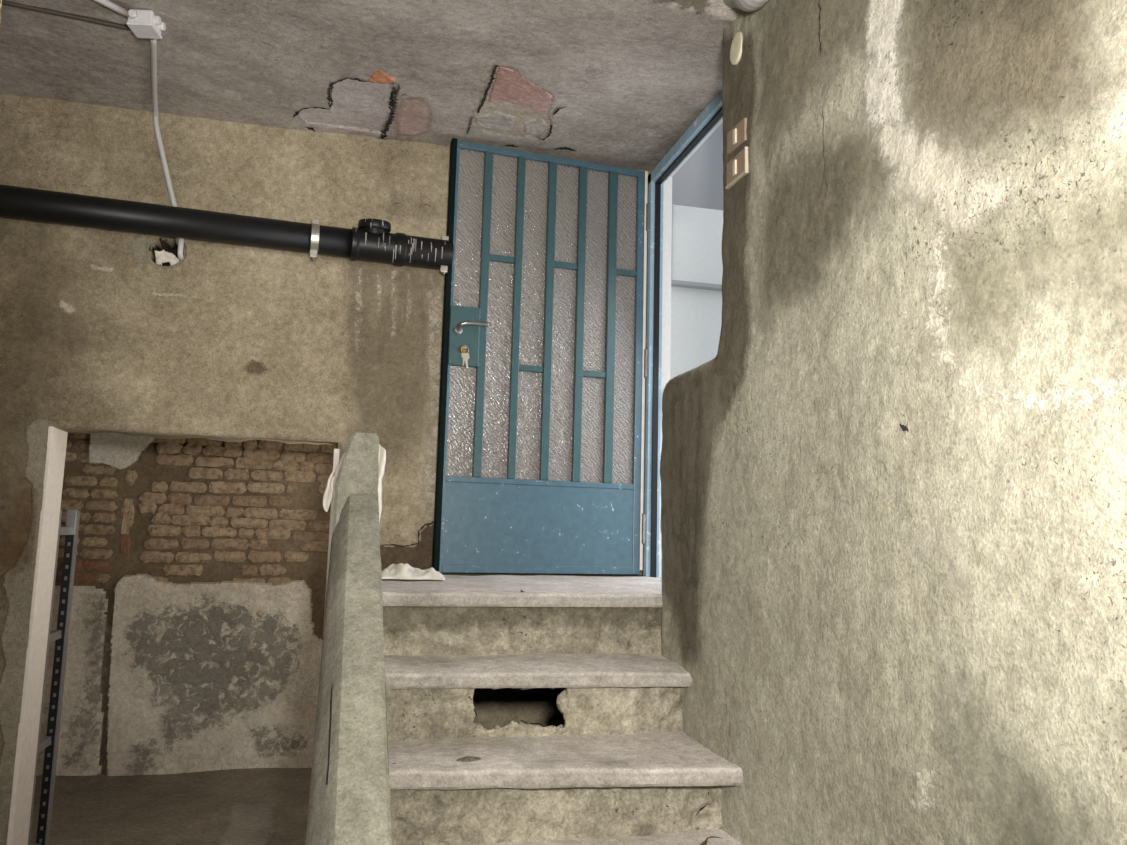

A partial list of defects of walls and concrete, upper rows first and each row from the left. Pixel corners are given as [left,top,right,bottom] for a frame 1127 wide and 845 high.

flaking render [293,71,431,140]
flaking render [466,65,575,151]
leakage [354,267,442,517]
leakage [383,0,1127,658]
leakage [61,596,111,769]
leakage [126,594,307,774]